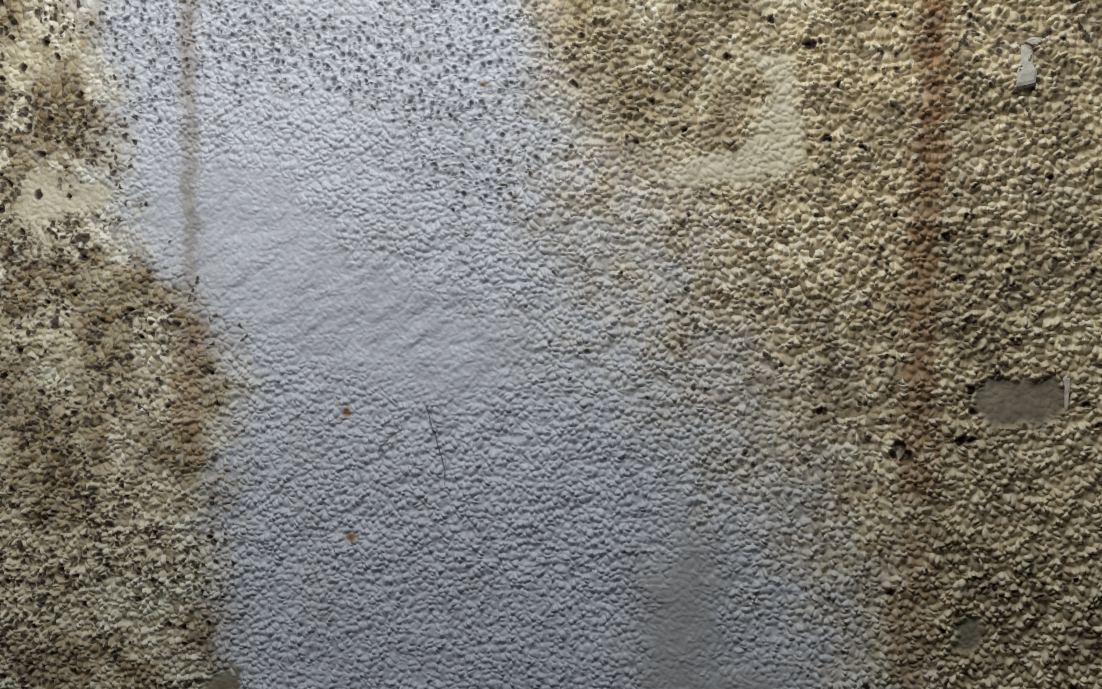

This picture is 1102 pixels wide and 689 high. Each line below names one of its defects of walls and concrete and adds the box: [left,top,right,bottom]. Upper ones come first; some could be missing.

damp [857,47,900,87]
damp [955,5,1081,176]
damp [1017,10,1092,71]
damp [867,245,890,274]
spalling [951,273,966,283]
damp [995,218,1096,313]
damp [0,0,840,689]
damp [878,353,897,375]
corrosion [879,0,963,689]
damp [950,298,1021,376]
spalling [954,372,1092,449]
damp [962,556,1070,615]